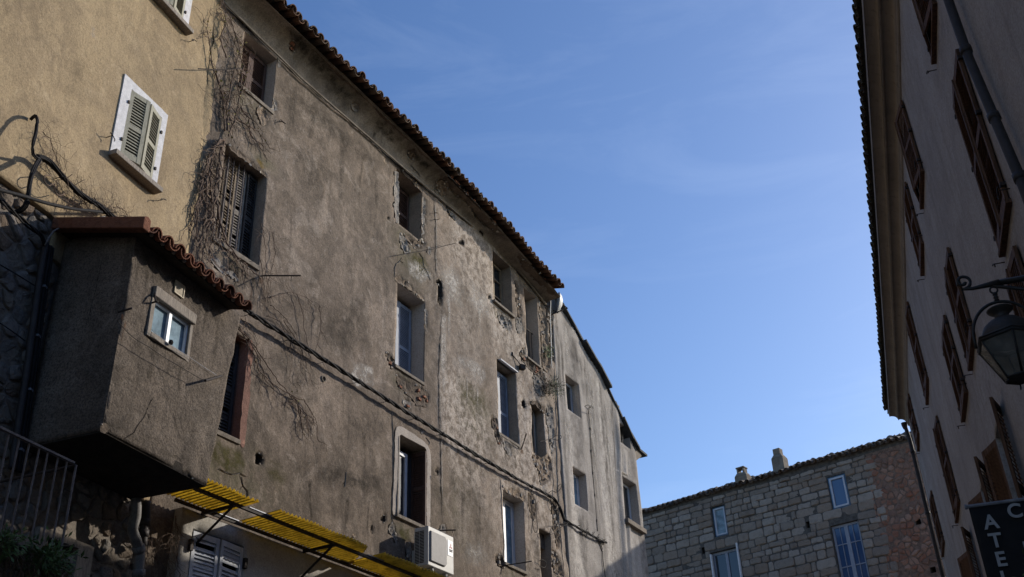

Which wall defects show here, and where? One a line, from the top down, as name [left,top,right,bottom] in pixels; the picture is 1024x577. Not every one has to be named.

spalling [384,150,431,255]
spalling [497,280,523,331]
spalling [385,351,430,410]
spalling [502,256,556,522]
spalling [491,417,512,456]